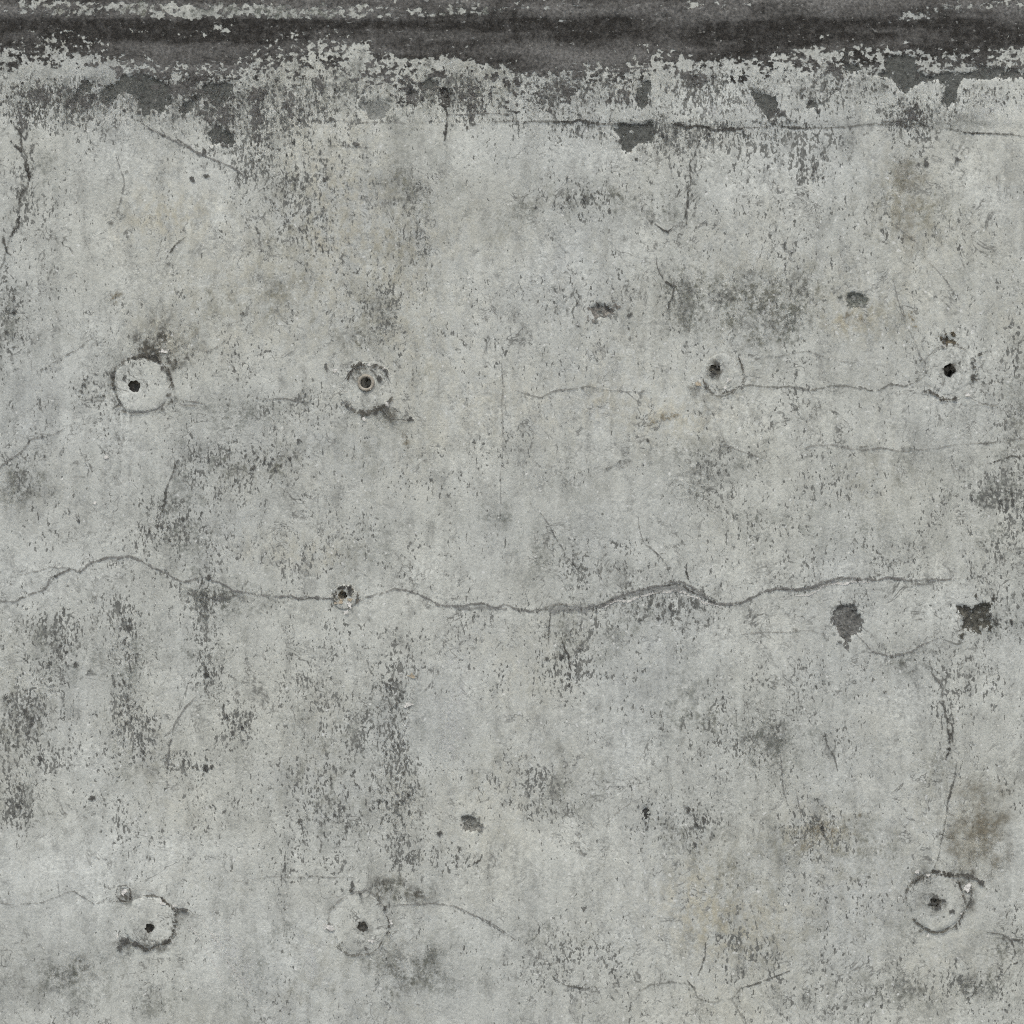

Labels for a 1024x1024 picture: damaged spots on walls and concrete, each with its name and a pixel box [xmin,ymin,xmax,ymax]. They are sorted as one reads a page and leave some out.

crack [0,121,36,269]
peeling [0,74,233,126]
peeling [202,125,235,156]
water stain [0,0,1024,167]
crack [430,80,819,233]
peeling [548,80,821,161]
peeling [844,50,1024,141]
crack [853,349,978,402]
crack [0,552,954,671]
spalling [830,597,865,650]
spalling [956,593,1019,641]
crack [944,710,955,803]